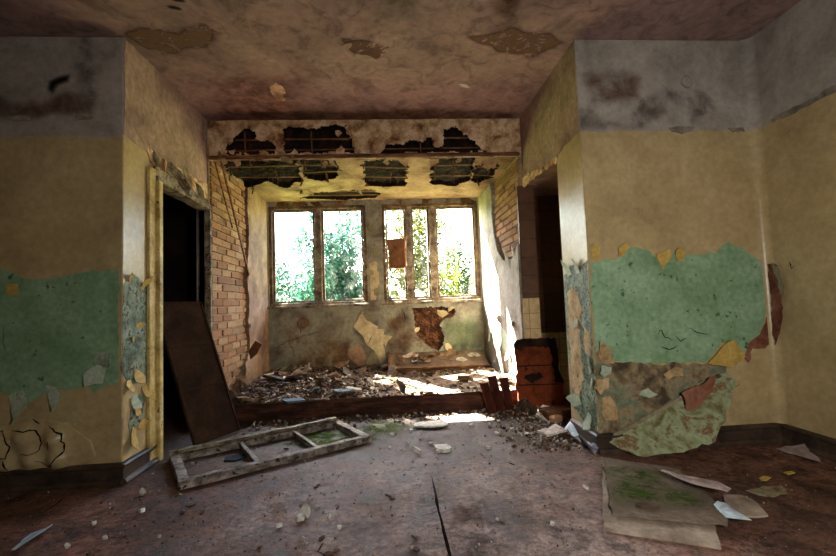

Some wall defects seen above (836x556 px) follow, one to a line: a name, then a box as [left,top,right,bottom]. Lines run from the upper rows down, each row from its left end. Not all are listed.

flaking render [148,122,557,390]